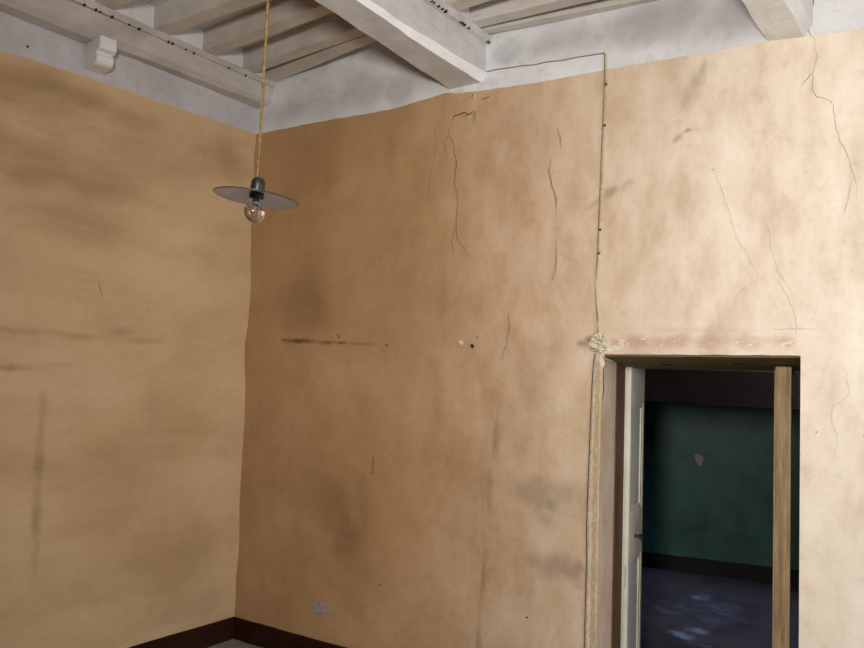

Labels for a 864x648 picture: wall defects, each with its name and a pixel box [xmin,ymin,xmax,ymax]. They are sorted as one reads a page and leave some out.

crack [443,118,474,262]
crack [550,239,558,280]
crack [548,128,561,214]
crack [712,164,826,343]
crack [801,31,857,216]
peeling [599,338,629,368]